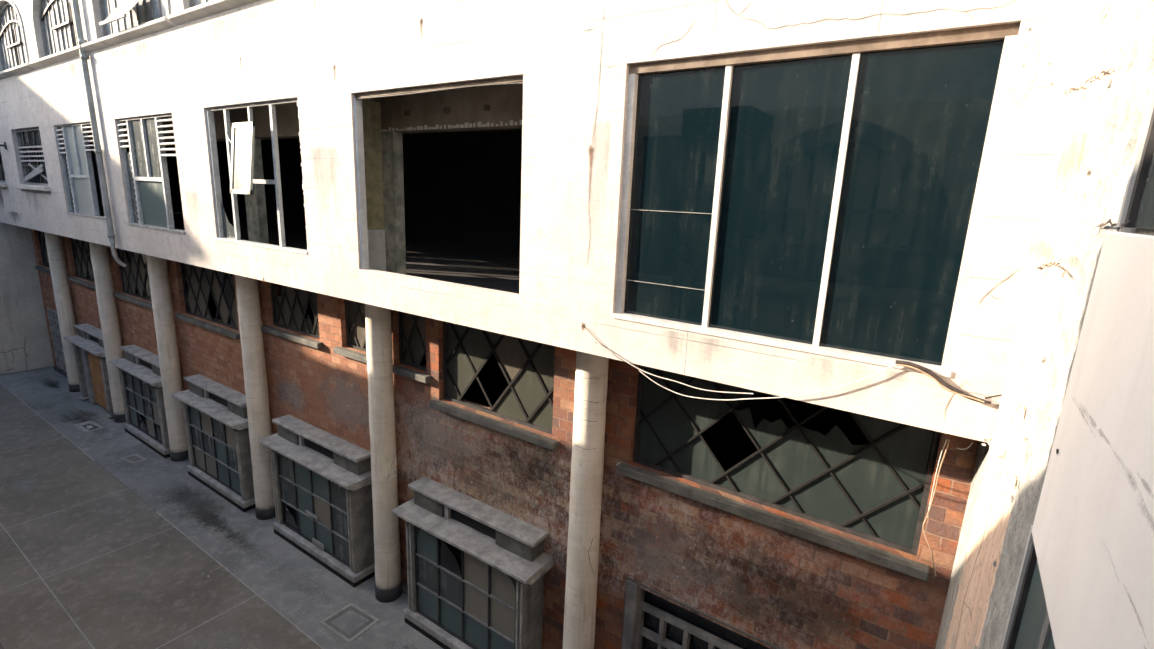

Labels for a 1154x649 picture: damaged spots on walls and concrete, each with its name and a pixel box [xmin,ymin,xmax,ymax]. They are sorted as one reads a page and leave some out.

crack [726,0,1015,29]
crack [1065,65,1118,107]
crack [978,259,1072,305]